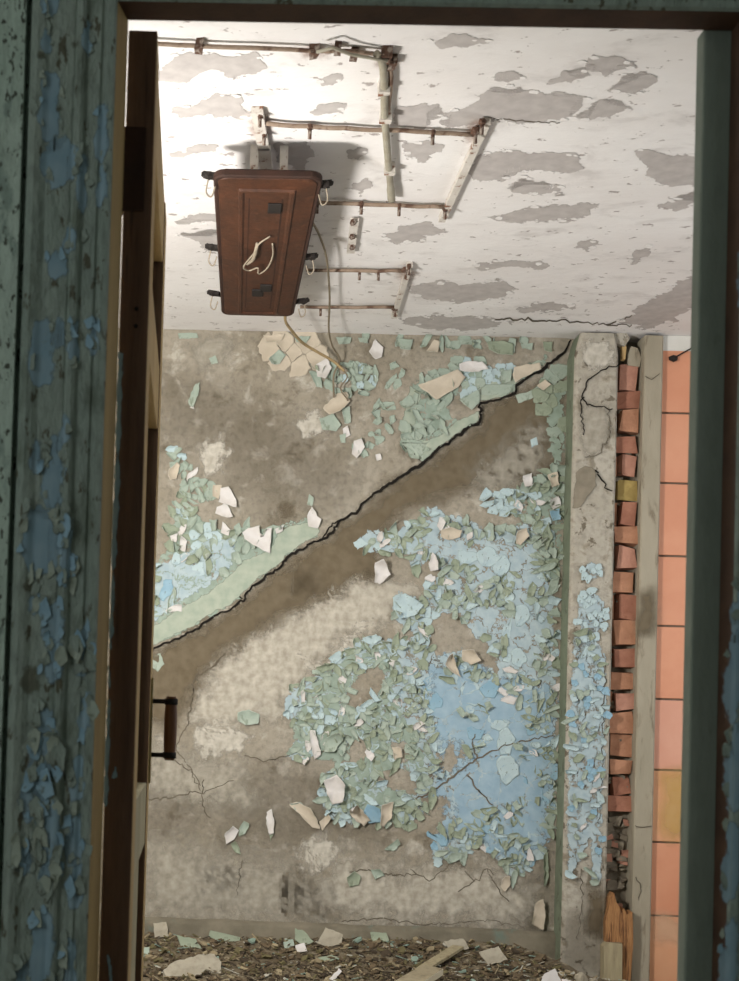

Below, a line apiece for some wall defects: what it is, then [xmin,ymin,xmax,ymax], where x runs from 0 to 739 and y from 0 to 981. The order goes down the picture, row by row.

peeling [175,213,217,253]
peeling [159,51,267,83]
peeling [273,141,316,170]
peeling [393,54,657,163]
peeling [468,149,598,224]
peeling [635,149,695,211]
peeling [616,276,692,330]
crack [153,315,632,650]
peeling [153,446,321,672]
peeling [257,259,615,892]
peeling [4,414,100,981]
peeling [720,572,739,903]